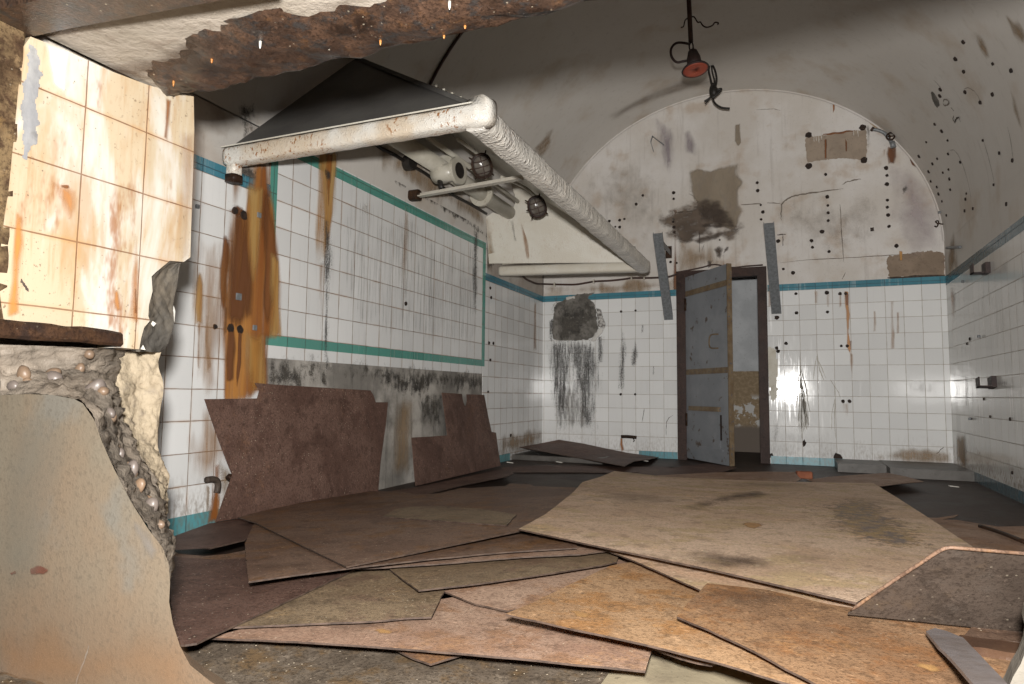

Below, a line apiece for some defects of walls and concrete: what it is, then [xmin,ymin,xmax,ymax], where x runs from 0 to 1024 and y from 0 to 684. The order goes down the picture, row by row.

peeling [805,124,868,169]
damp [271,221,332,386]
damp [660,166,742,267]
peeling [886,250,946,279]
spalling [0,261,182,584]
damp [364,367,483,424]
rust [170,153,1024,684]